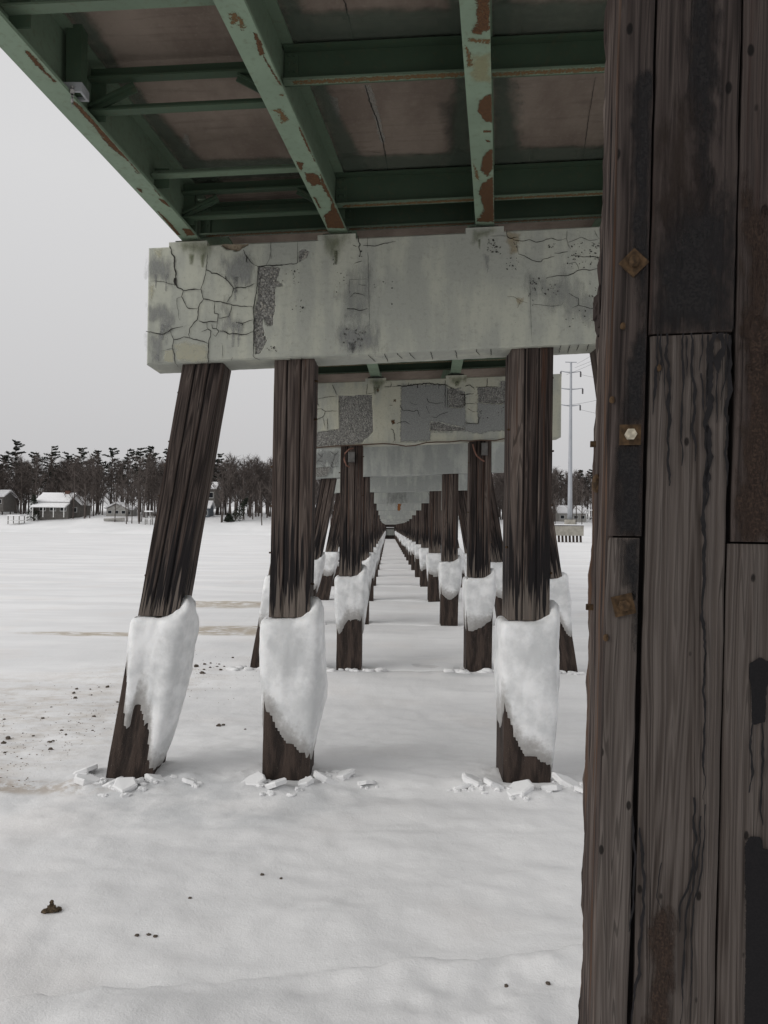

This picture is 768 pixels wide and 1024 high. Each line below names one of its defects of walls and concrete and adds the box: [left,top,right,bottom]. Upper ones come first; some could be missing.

corrosion [25,51,56,82]
corrosion [229,0,490,96]
corrosion [73,101,138,174]
corrosion [296,94,603,231]
corrosion [136,188,195,236]
crack [146,242,298,367]
spalling [254,267,282,354]
crack [501,232,599,334]
spalling [317,395,373,447]